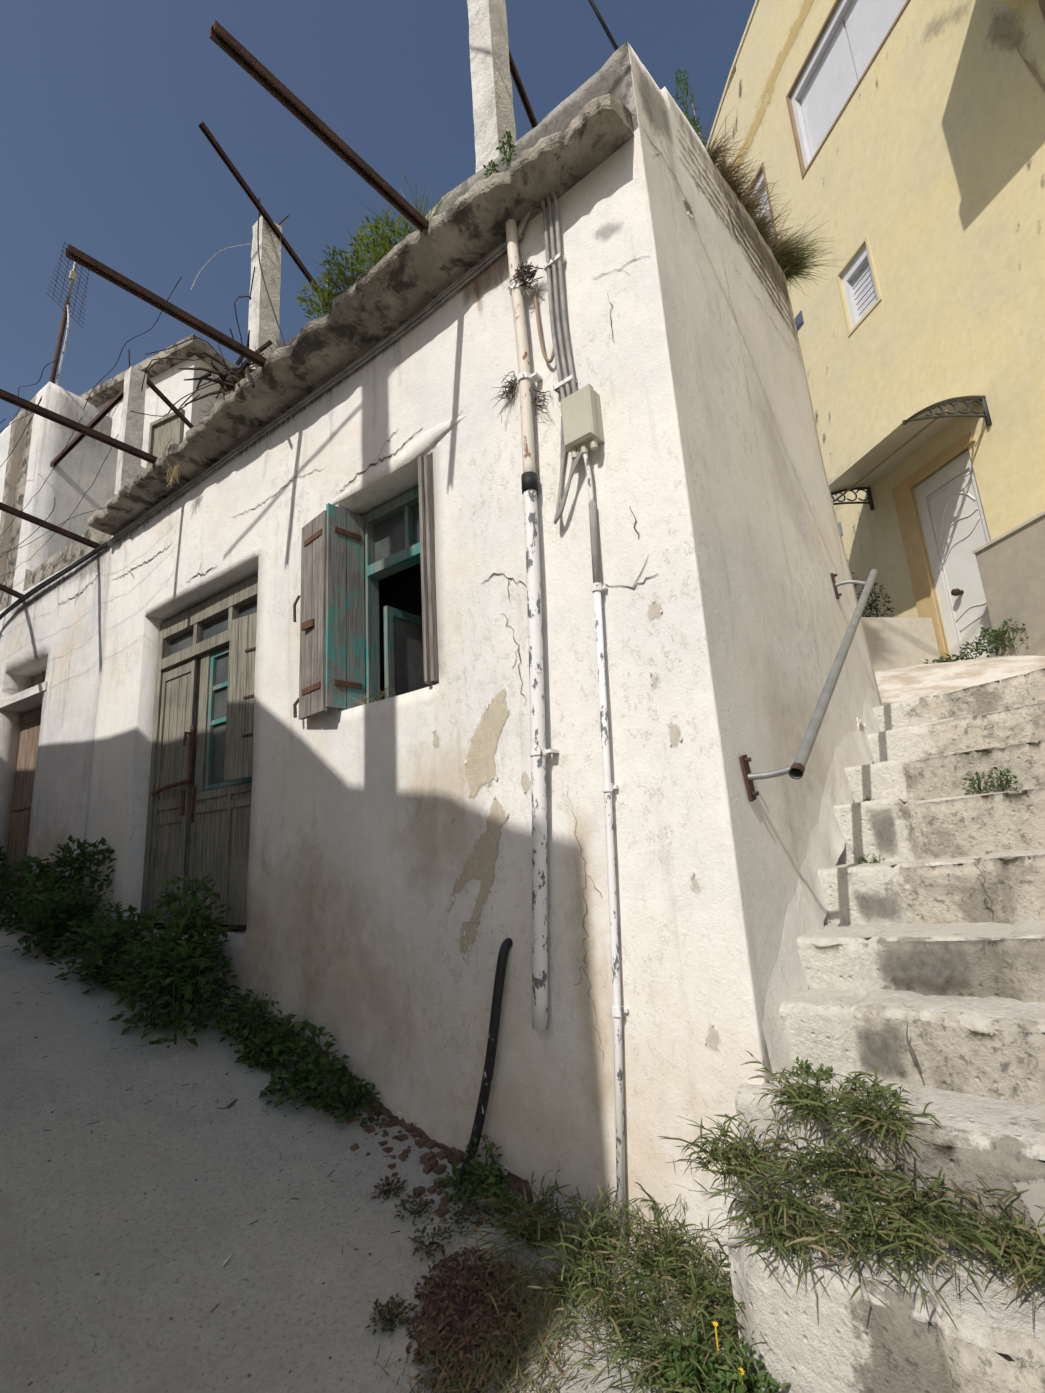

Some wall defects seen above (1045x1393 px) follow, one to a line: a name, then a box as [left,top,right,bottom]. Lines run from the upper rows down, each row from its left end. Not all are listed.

peeling [448,688,509,961]
spalling [521,771,530,793]